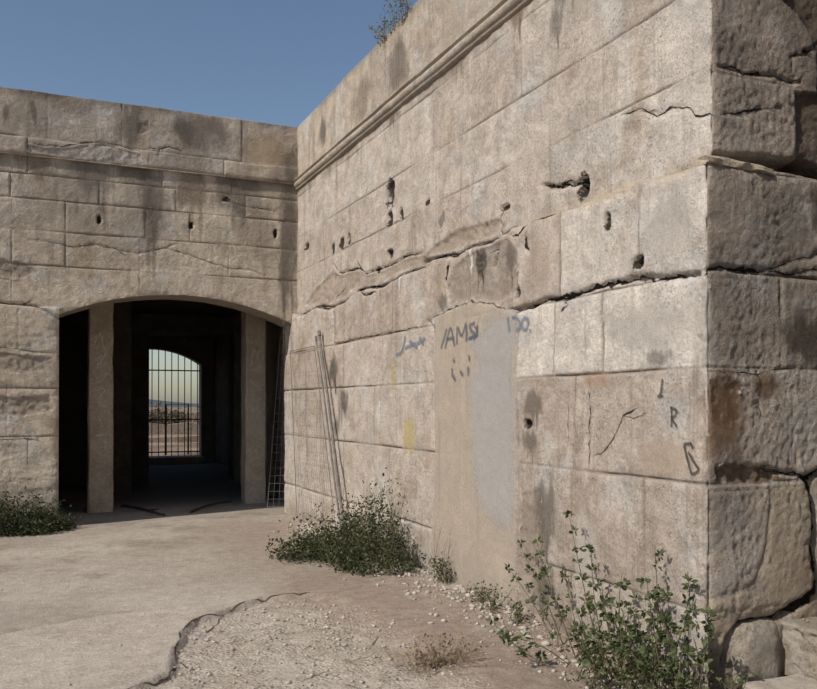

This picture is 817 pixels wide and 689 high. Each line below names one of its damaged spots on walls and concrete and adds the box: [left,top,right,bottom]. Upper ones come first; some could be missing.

crack [719,47,817,83]
crack [624,106,779,117]
crack [304,210,554,315]
crack [336,253,817,343]
water stain [525,392,540,420]
crack [567,390,647,458]
corrosion [708,372,741,450]
crack [716,368,789,411]
crack [736,468,817,622]